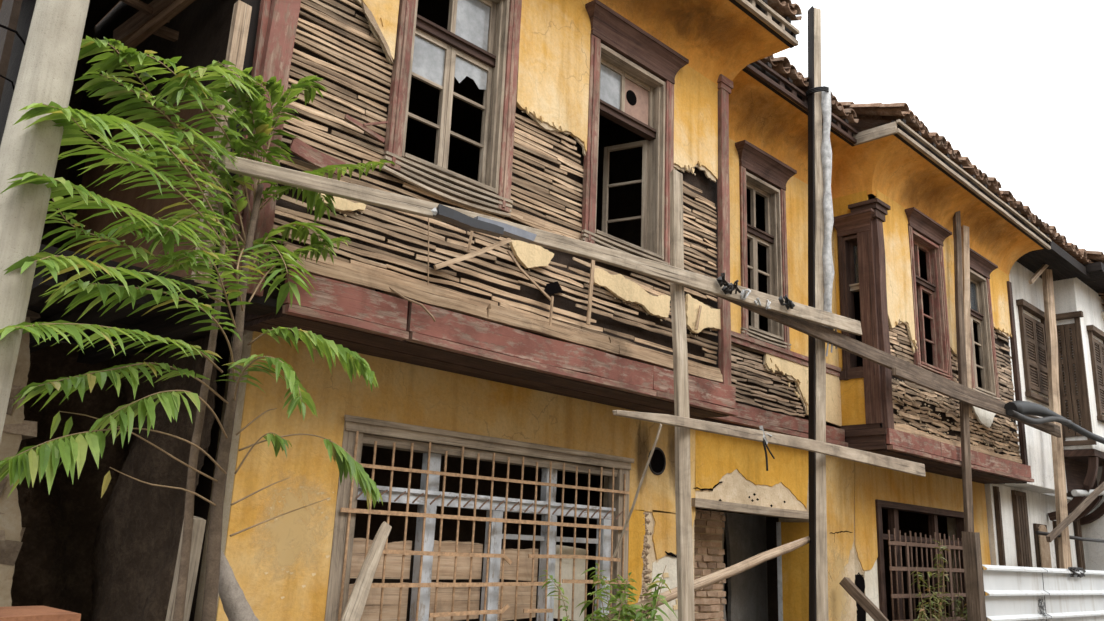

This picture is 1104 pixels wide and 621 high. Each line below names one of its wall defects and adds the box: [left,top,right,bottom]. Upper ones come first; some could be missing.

flaking render [280,0,583,240]
flaking render [268,183,673,371]
flaking render [674,161,718,279]
flaking render [684,287,808,417]
flaking render [888,319,918,364]
flaking render [891,327,1022,464]
flaking render [695,471,807,511]
flaking render [640,511,678,621]